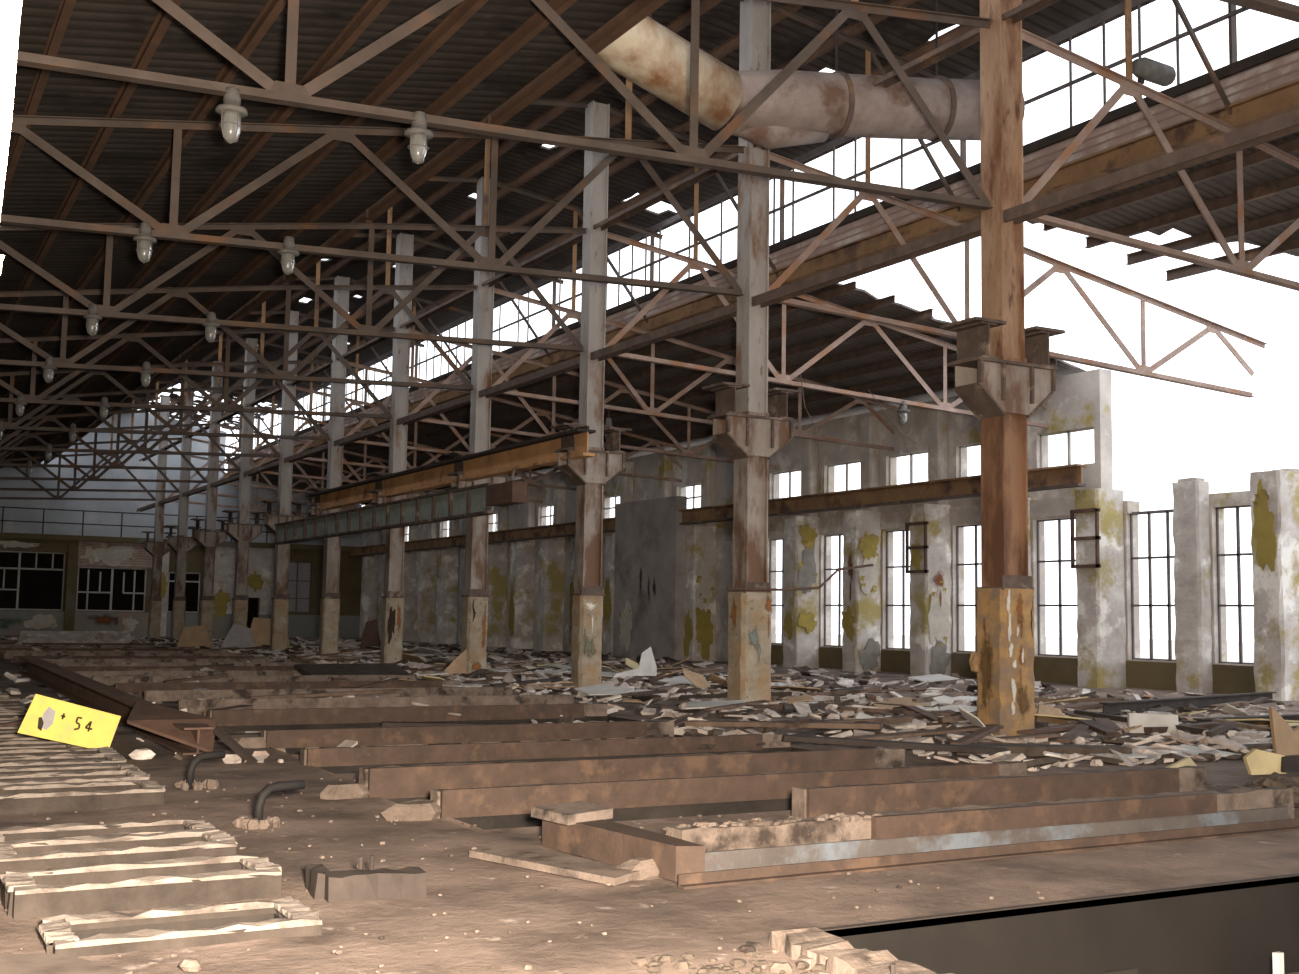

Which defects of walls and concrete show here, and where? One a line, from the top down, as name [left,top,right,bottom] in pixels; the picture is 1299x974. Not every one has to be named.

peeling [1006,589,1024,715]